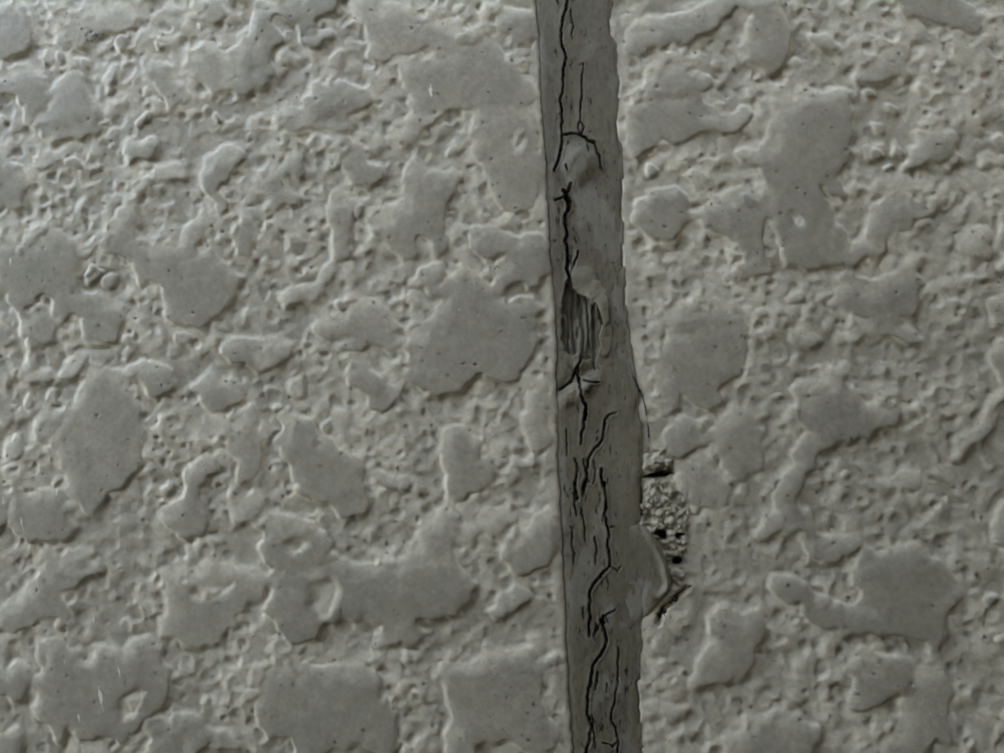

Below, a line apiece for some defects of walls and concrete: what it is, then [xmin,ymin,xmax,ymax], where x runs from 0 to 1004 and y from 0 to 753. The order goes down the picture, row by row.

crack [554,0,605,289]
peeling [561,265,612,368]
crack [562,356,629,753]
spalling [640,445,691,587]